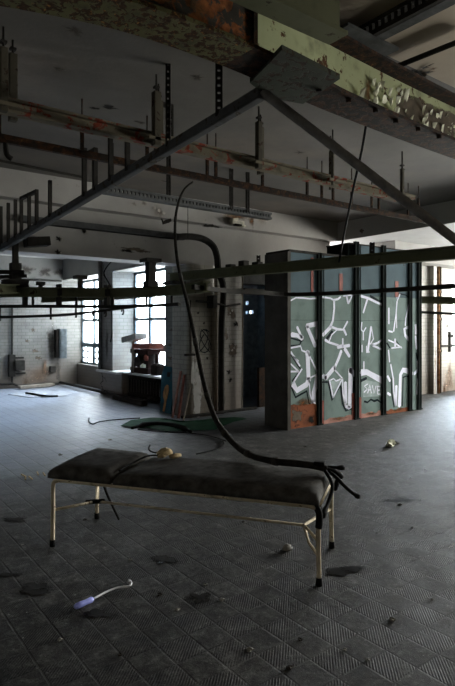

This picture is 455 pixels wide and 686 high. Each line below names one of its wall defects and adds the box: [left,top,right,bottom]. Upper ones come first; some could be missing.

peeling [359,78,455,137]
corrosion [291,399,352,429]
corrosion [361,407,408,418]